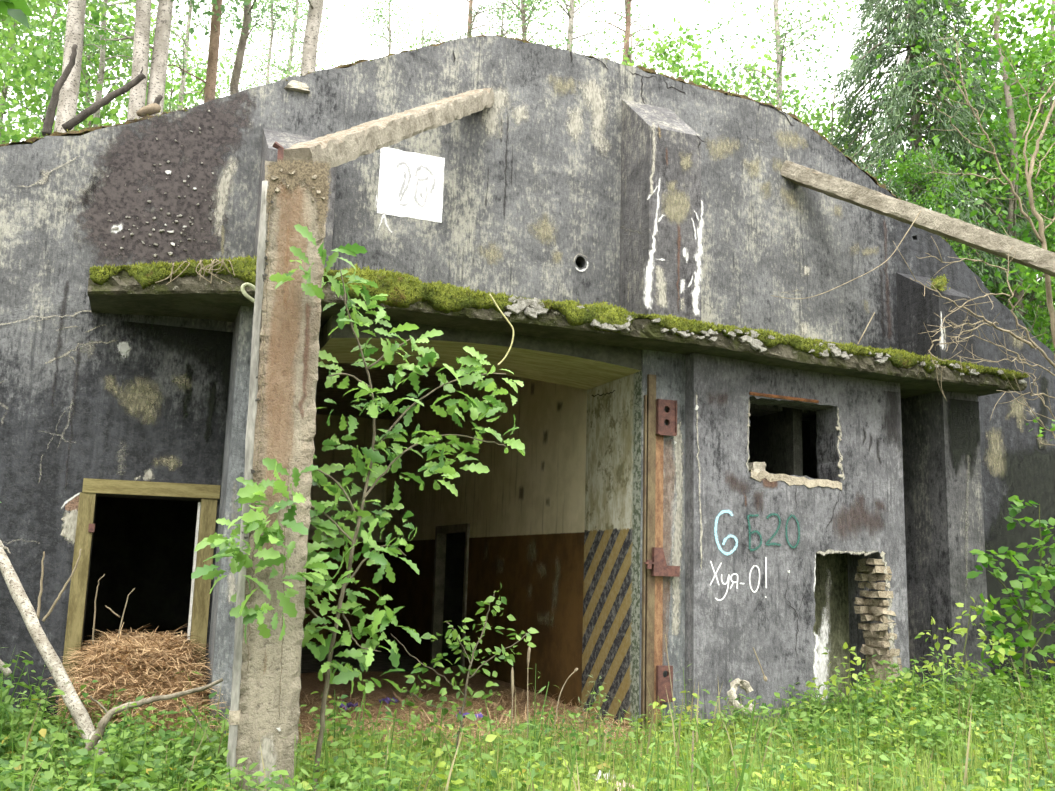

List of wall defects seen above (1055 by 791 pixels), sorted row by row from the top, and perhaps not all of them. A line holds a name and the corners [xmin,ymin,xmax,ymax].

leakage [644,179,666,308]
leakage [680,201,703,315]
corrosion [299,304,310,416]
spalling [835,409,845,479]
spalling [813,550,900,675]